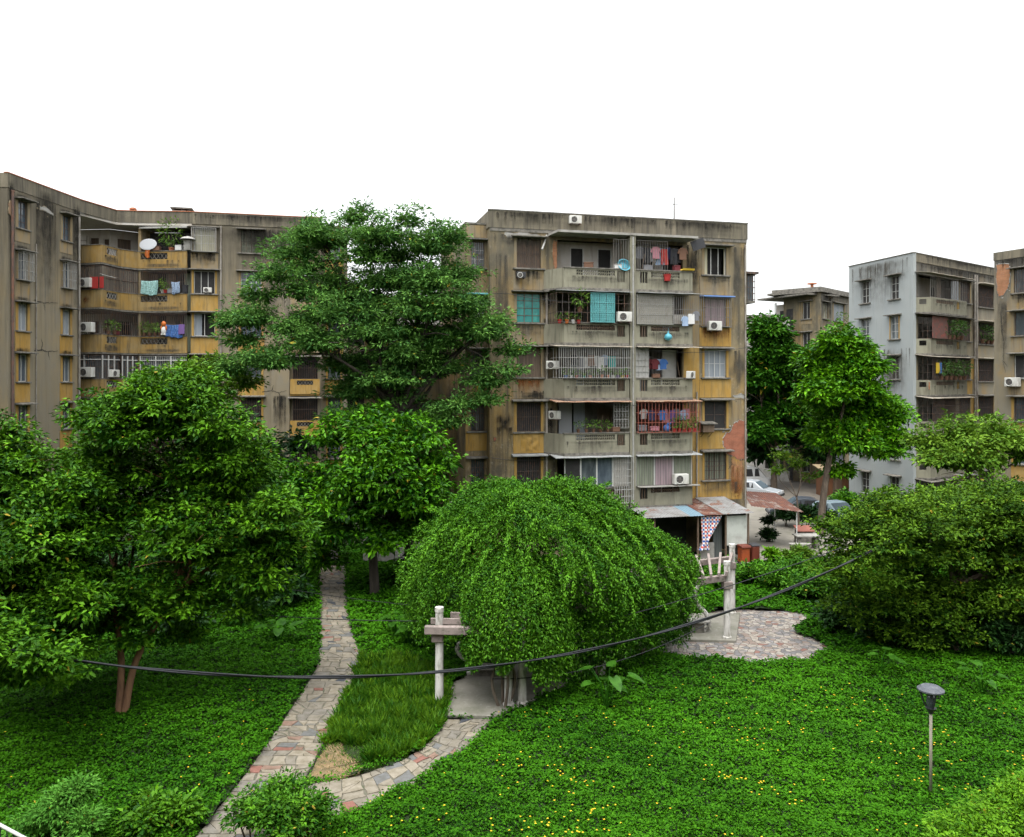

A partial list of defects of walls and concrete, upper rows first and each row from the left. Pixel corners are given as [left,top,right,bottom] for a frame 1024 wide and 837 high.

spalling [996,263,1011,299]
spalling [722,420,747,486]